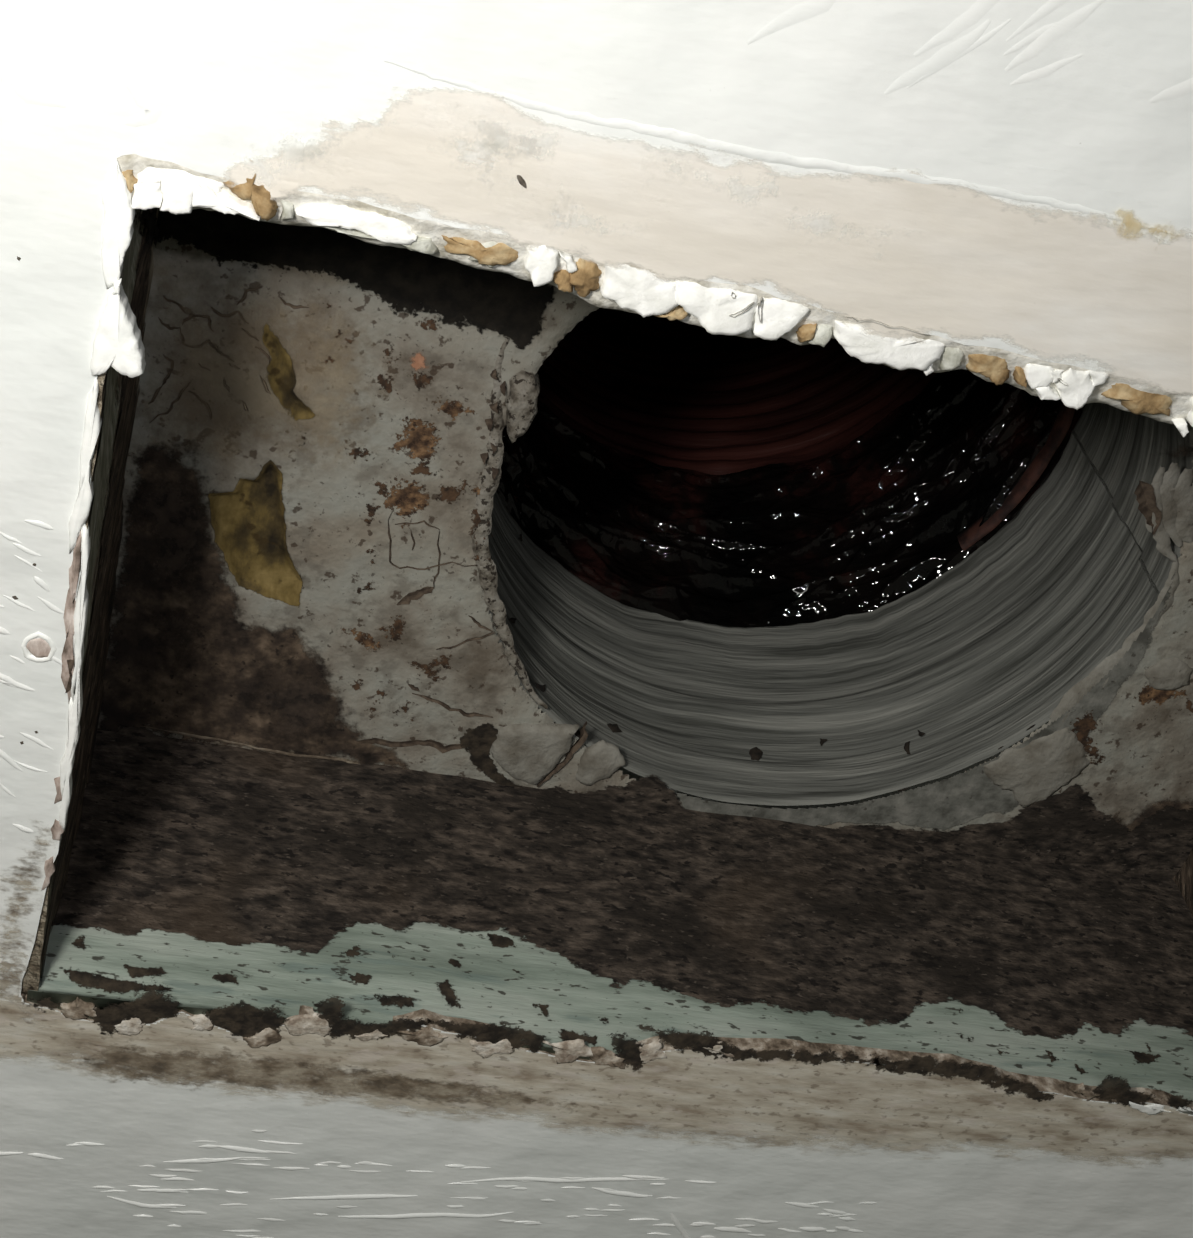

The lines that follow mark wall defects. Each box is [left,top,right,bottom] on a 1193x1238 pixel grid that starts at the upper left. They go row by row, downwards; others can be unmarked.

leakage [130,208,555,349]
peeling [90,59,1193,437]
leakage [1118,211,1160,233]
crack [148,286,309,424]
rust [377,346,433,394]
spalling [208,460,303,606]
rust [364,395,489,561]
leakage [40,375,1193,1064]
rust [1070,710,1105,765]
rust [1135,685,1193,713]
leakage [0,982,1193,1164]
spalling [22,980,1193,1115]